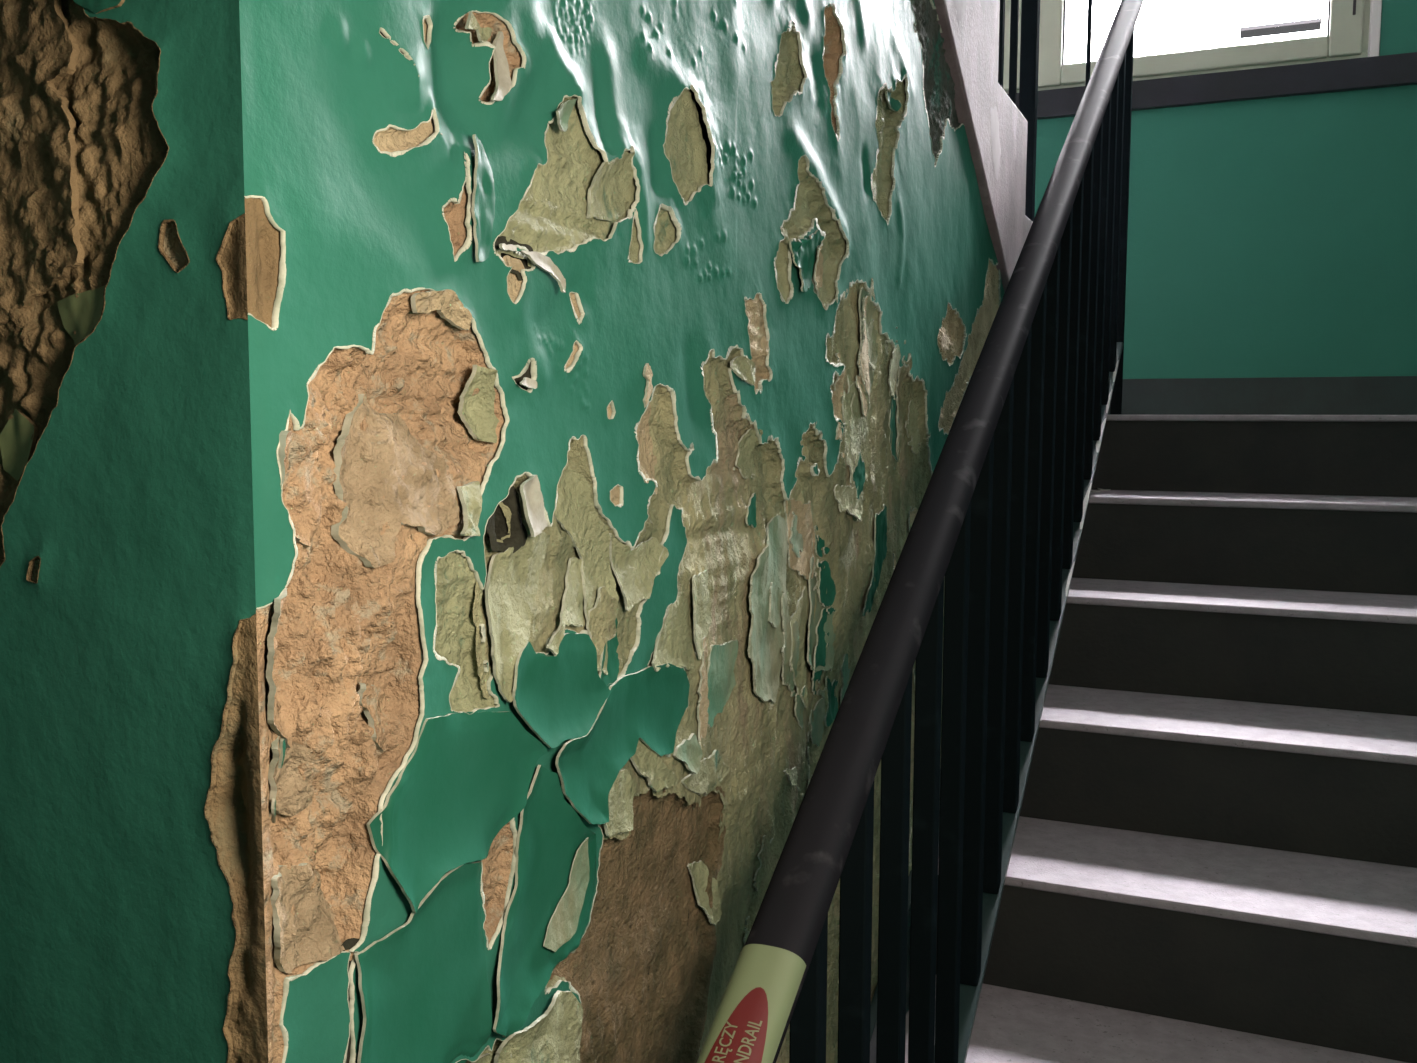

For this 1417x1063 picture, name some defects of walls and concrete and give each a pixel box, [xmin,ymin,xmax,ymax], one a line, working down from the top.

peeling [453,10,526,105]
peeling [771,20,807,117]
peeling [822,4,847,141]
peeling [442,84,715,304]
peeling [871,74,908,225]
spalling [0,0,169,567]
peeling [26,556,41,584]
peeling [204,155,933,1063]